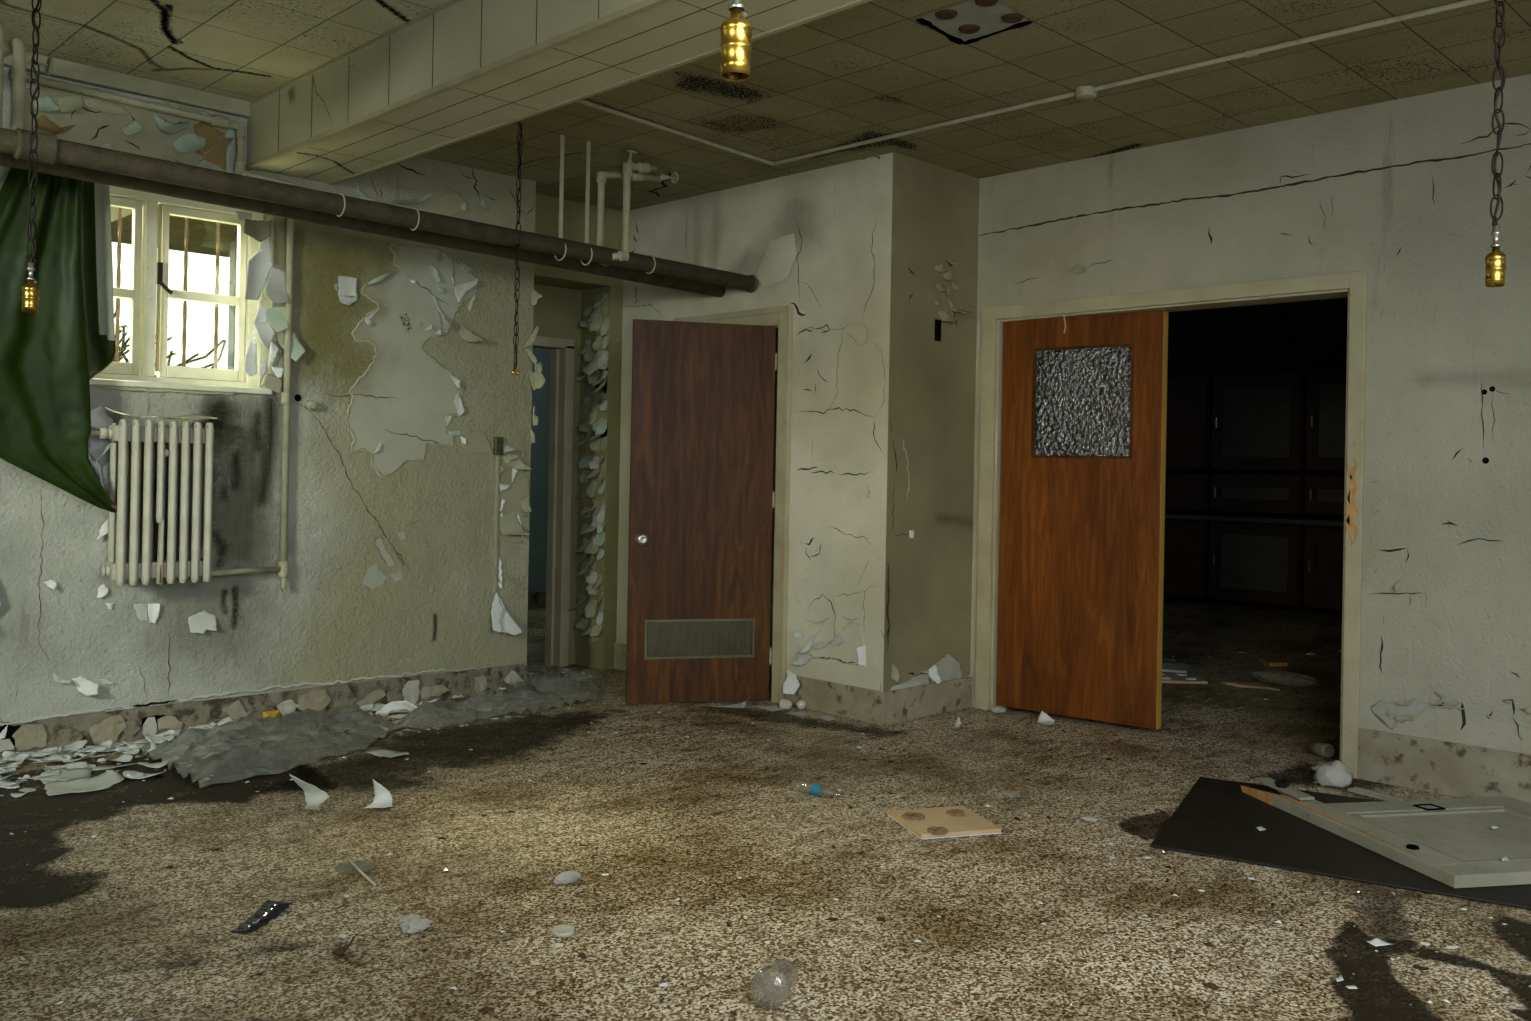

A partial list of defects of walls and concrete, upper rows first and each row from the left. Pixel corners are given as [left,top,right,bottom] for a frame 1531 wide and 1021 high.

peeling [25,85,236,173]
crack [979,123,1531,246]
peeling [235,211,306,402]
peeling [88,406,218,493]
peeling [325,242,546,635]
peeling [566,292,609,642]
crack [791,221,909,646]
peeling [133,603,160,623]
peeling [188,610,217,635]
peeling [0,667,483,797]
peeling [289,774,330,810]
peeling [365,779,393,808]